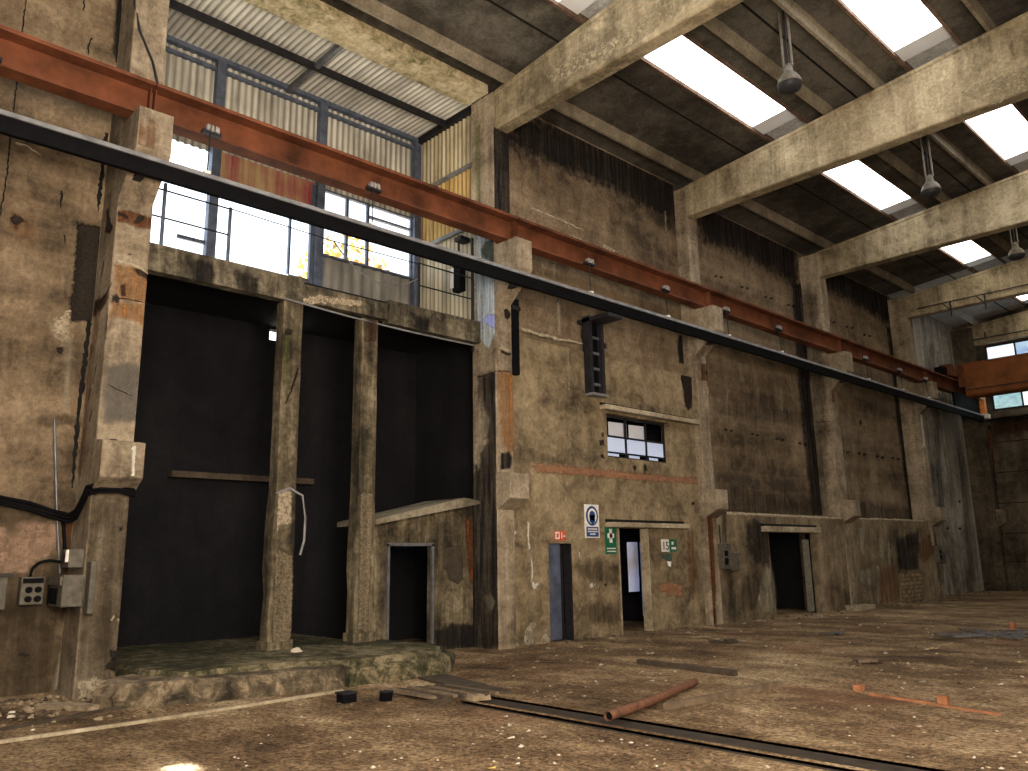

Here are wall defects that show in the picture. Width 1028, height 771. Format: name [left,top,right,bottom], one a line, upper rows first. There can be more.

crack [0,81,18,216]